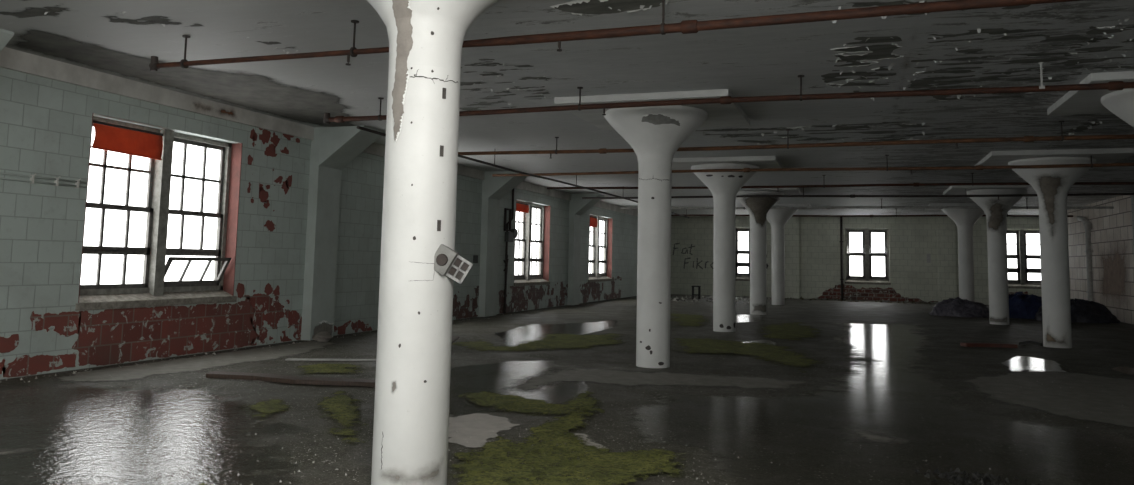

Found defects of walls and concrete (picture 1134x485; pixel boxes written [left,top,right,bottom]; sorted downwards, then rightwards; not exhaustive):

peeling [0,0,68,18]
peeling [105,11,202,27]
peeling [549,0,669,16]
peeling [826,0,946,23]
peeling [392,0,416,142]
peeling [821,18,1134,101]
spalling [247,128,300,232]
damp [1038,176,1062,236]
spalling [452,286,479,320]
spalling [499,276,622,314]
spalling [816,284,939,303]
spalling [0,283,372,378]